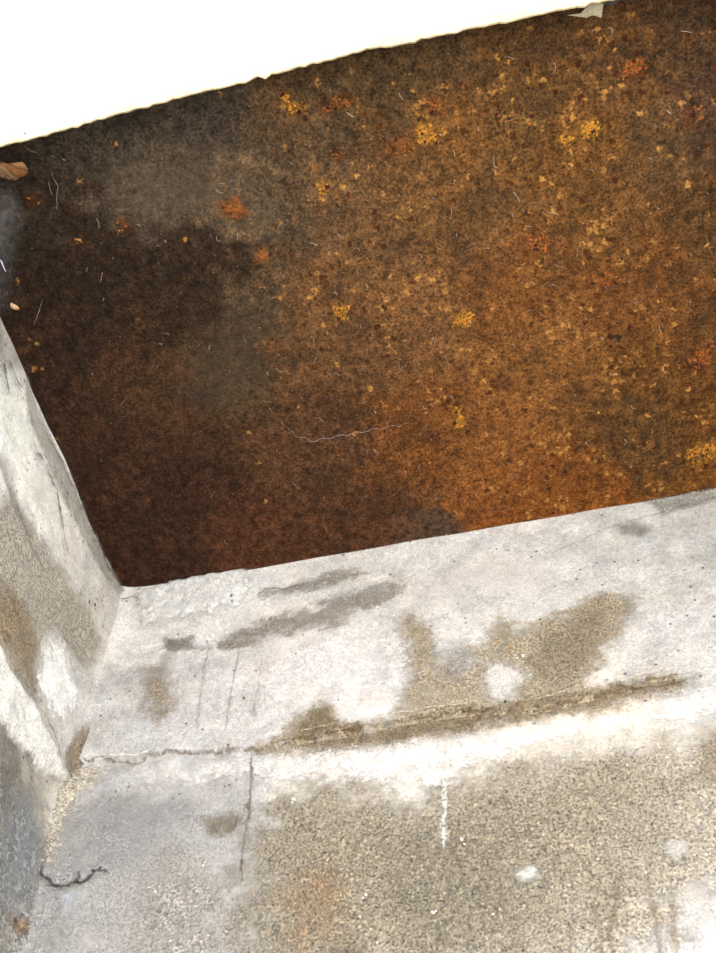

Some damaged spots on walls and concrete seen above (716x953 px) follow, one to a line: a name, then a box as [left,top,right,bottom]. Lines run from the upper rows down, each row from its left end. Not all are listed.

corrosion [622,59,647,79]
corrosion [379,97,445,154]
corrosion [495,109,545,132]
corrosion [559,119,606,146]
corrosion [452,309,475,328]
leakage [0,390,40,461]
corrosion [450,406,467,430]
corrosion [685,442,716,466]
leakage [0,463,100,717]
leakage [260,569,359,596]
leakage [0,583,716,953]
crack [83,668,695,883]